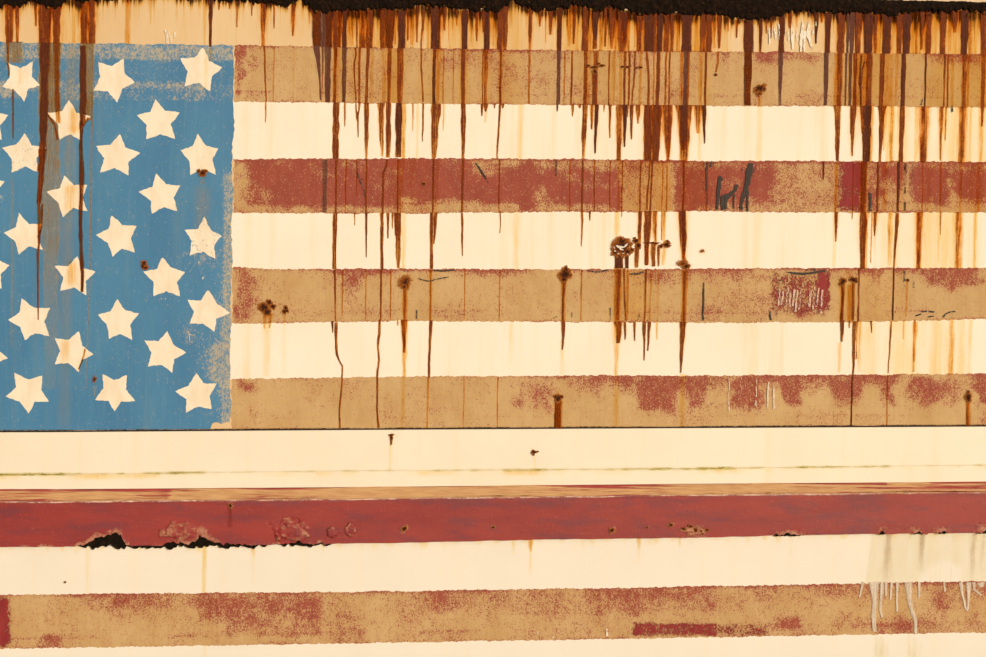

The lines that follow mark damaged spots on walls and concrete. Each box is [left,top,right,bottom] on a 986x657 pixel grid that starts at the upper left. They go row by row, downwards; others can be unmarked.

corrosion [0,0,141,320]
corrosion [176,0,986,428]
corrosion [668,522,710,536]